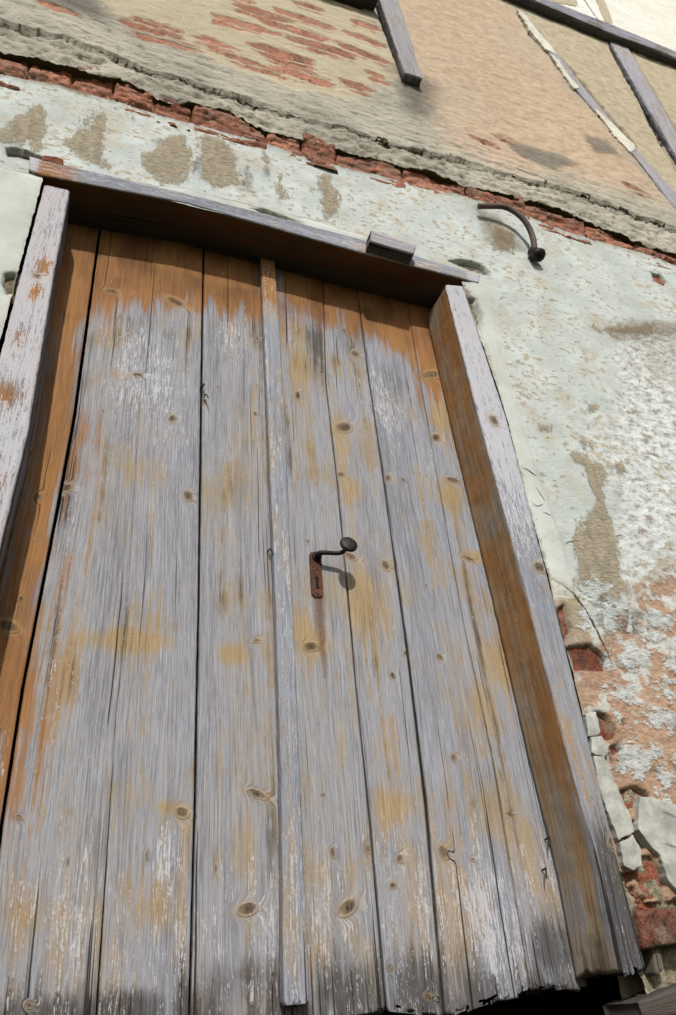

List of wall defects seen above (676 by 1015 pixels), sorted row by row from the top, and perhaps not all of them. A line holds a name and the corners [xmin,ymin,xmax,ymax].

spalling [40,1,77,16]
spalling [120,0,388,96]
peeling [516,9,579,91]
spalling [0,58,676,286]
peeling [592,322,652,336]
peeling [554,439,676,910]